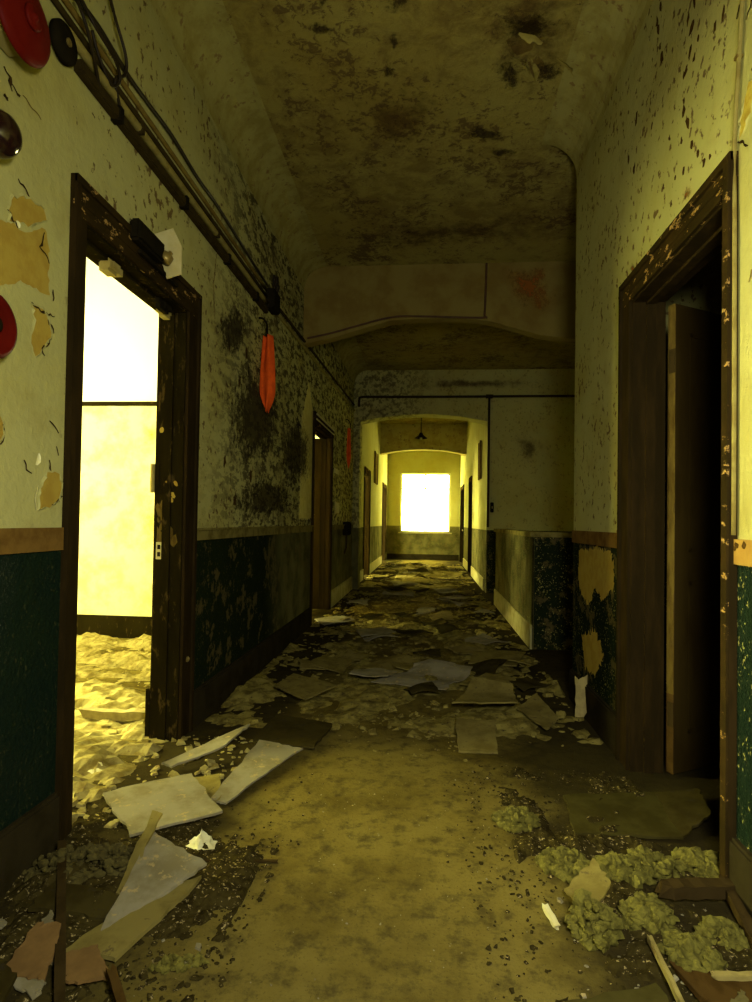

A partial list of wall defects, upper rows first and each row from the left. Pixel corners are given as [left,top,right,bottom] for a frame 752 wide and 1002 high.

damp [505,0,559,79]
damp [471,126,511,156]
damp [214,304,310,518]
peeling [24,453,63,511]
peeling [578,546,614,605]
peeling [582,627,604,678]